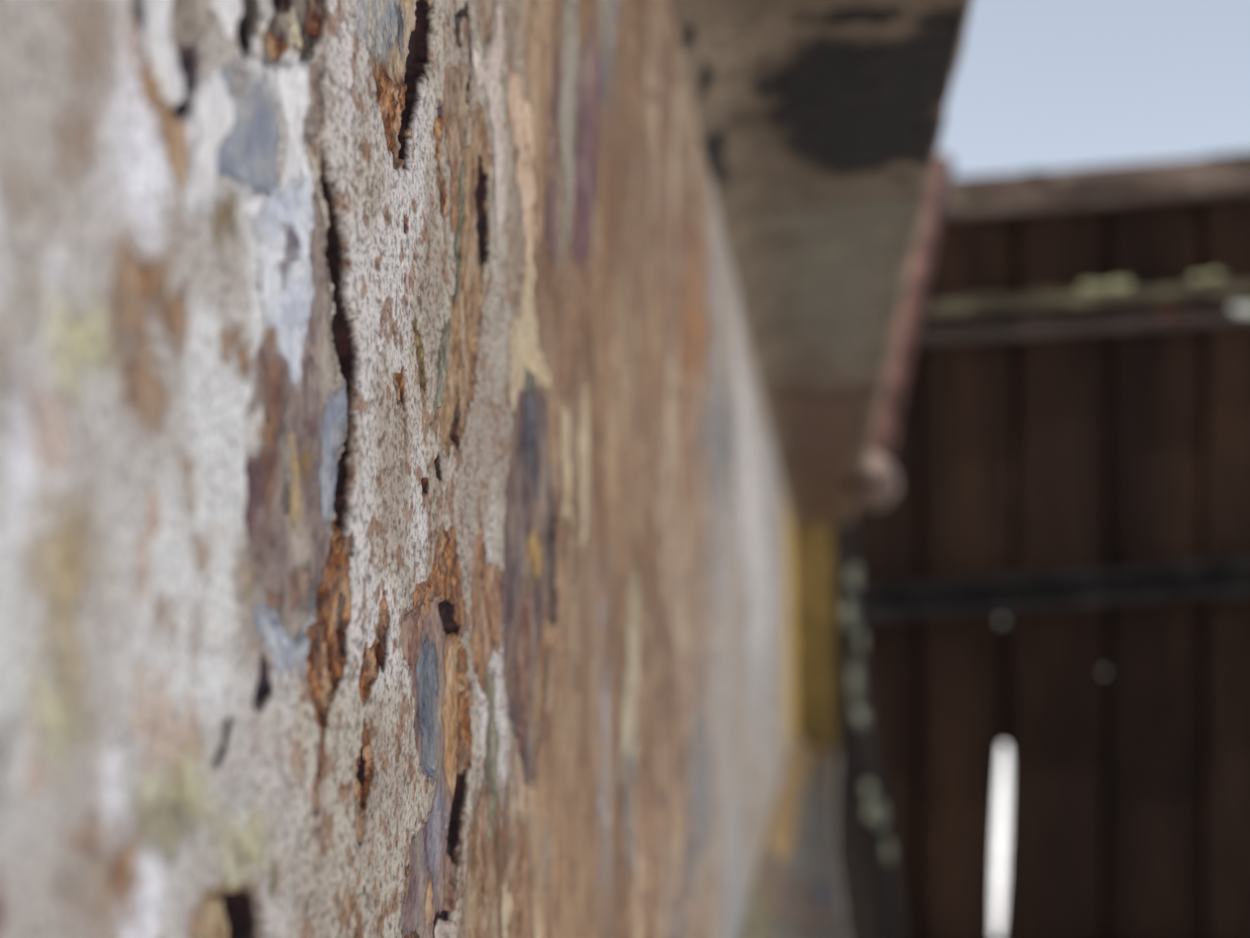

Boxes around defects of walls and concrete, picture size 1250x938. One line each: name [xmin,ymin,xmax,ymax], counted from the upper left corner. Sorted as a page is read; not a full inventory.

crack [304,0,325,39]
peeling [131,0,354,730]
crack [320,157,355,546]
peeling [354,0,619,938]
spalling [216,887,255,938]